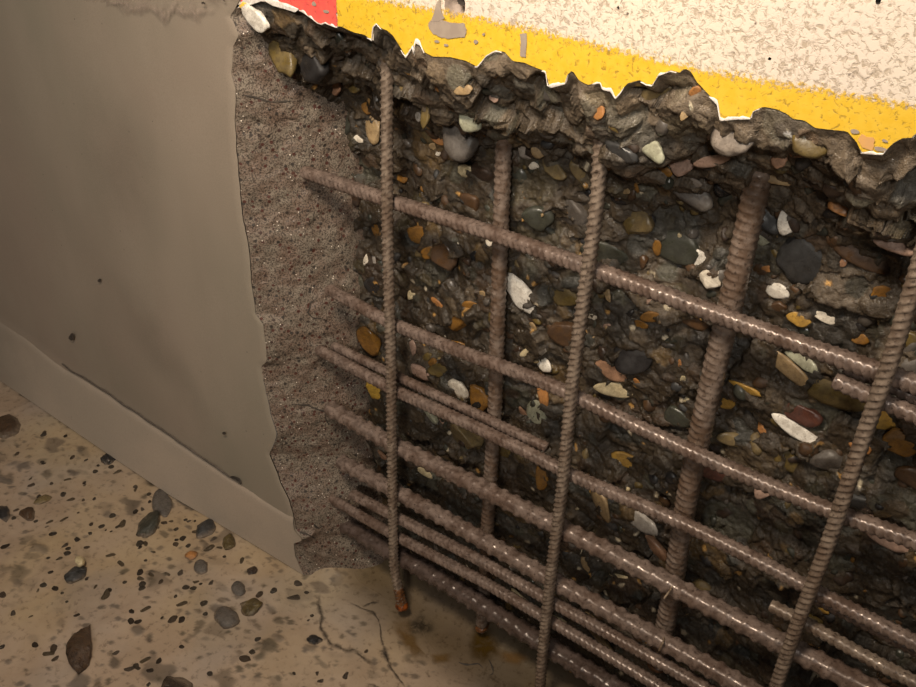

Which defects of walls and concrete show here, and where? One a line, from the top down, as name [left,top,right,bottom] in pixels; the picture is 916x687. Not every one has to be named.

crack [318,602,402,687]
spalling [232,0,916,687]